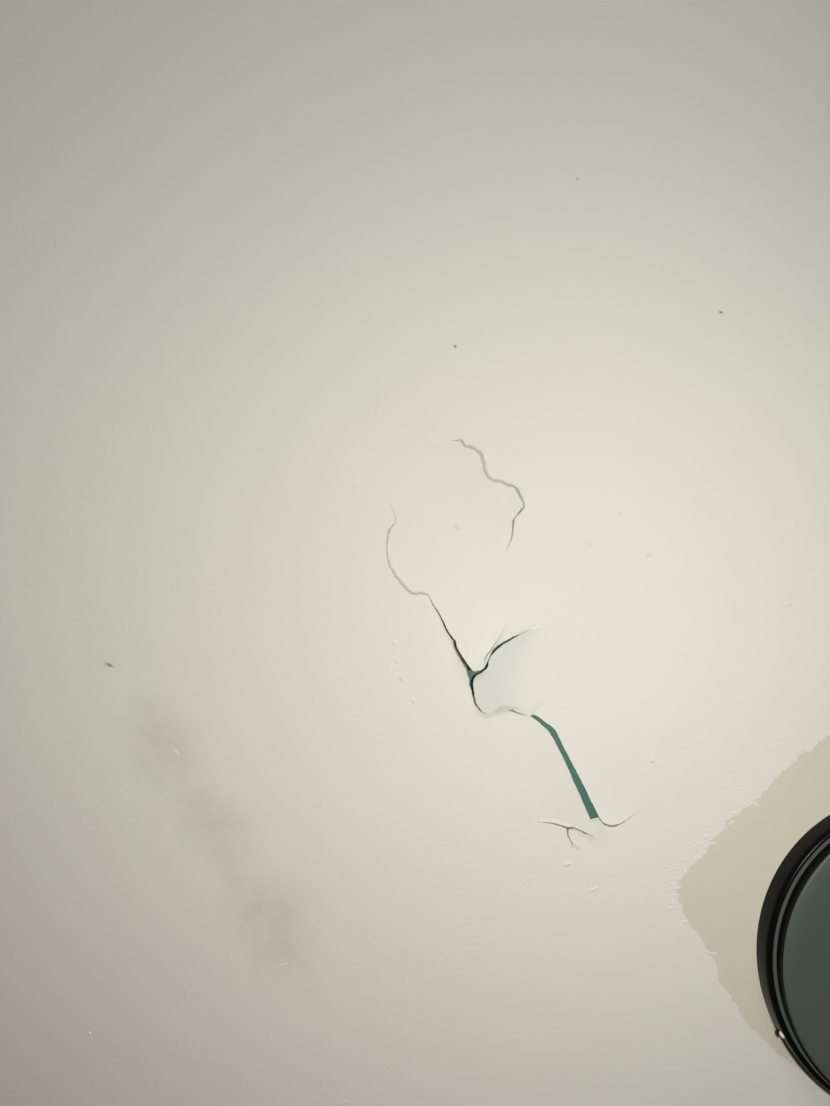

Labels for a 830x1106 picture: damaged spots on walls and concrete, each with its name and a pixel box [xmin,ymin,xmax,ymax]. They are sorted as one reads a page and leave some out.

peeling [429,573,641,849]